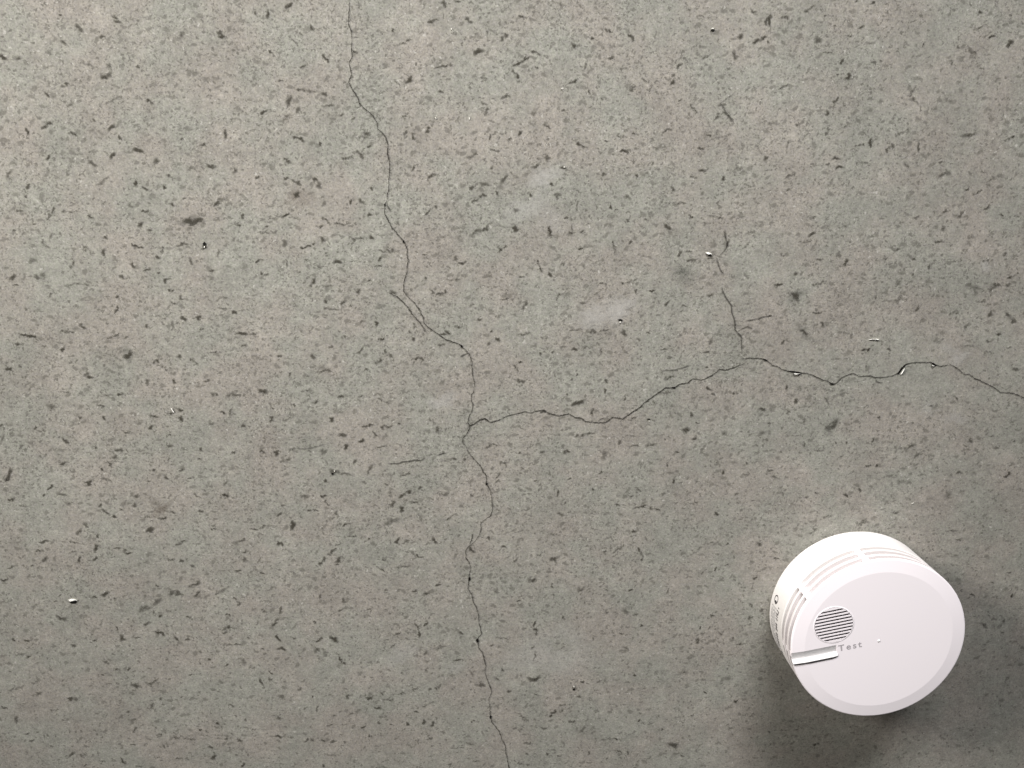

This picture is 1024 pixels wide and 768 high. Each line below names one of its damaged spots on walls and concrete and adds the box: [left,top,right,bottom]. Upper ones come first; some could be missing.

crack [347,3,1024,767]